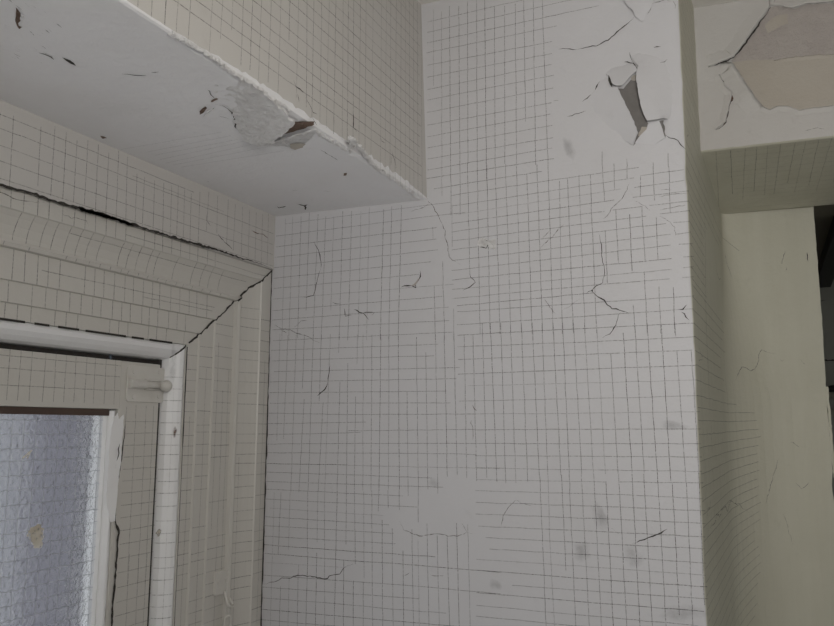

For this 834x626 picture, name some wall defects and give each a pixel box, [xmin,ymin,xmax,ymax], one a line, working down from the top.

spalling [167,31,317,150]
crack [562,22,629,50]
peeling [587,53,673,146]
peeling [706,0,834,119]
crack [587,186,684,336]
crack [0,183,352,626]